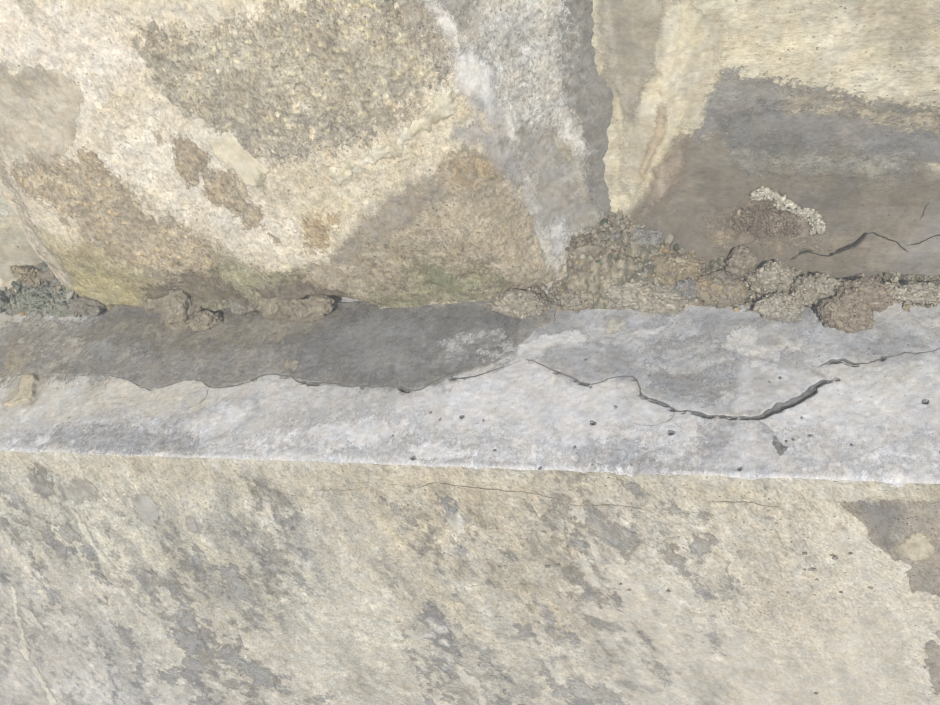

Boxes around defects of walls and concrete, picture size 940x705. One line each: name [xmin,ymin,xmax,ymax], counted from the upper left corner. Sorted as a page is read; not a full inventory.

leakage [140,0,940,314]
flaking render [0,58,729,393]
crack [790,204,940,260]
spalling [730,278,765,312]
spalling [845,271,940,285]
spalling [885,300,937,312]
crack [64,348,940,432]
leakage [923,631,940,695]